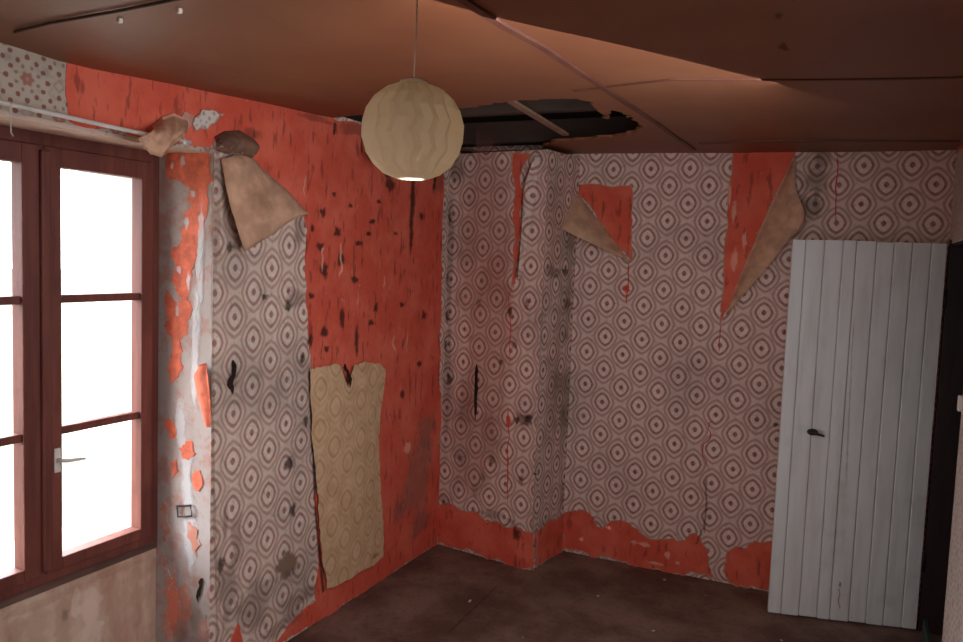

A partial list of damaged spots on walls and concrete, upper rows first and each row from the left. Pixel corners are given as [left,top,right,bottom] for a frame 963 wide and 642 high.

peeling [164,153,214,384]
spalling [227,360,237,394]
peeling [164,418,196,476]
peeling [192,470,203,491]
peeling [186,521,201,556]
peeling [276,551,297,580]
peeling [160,559,210,642]